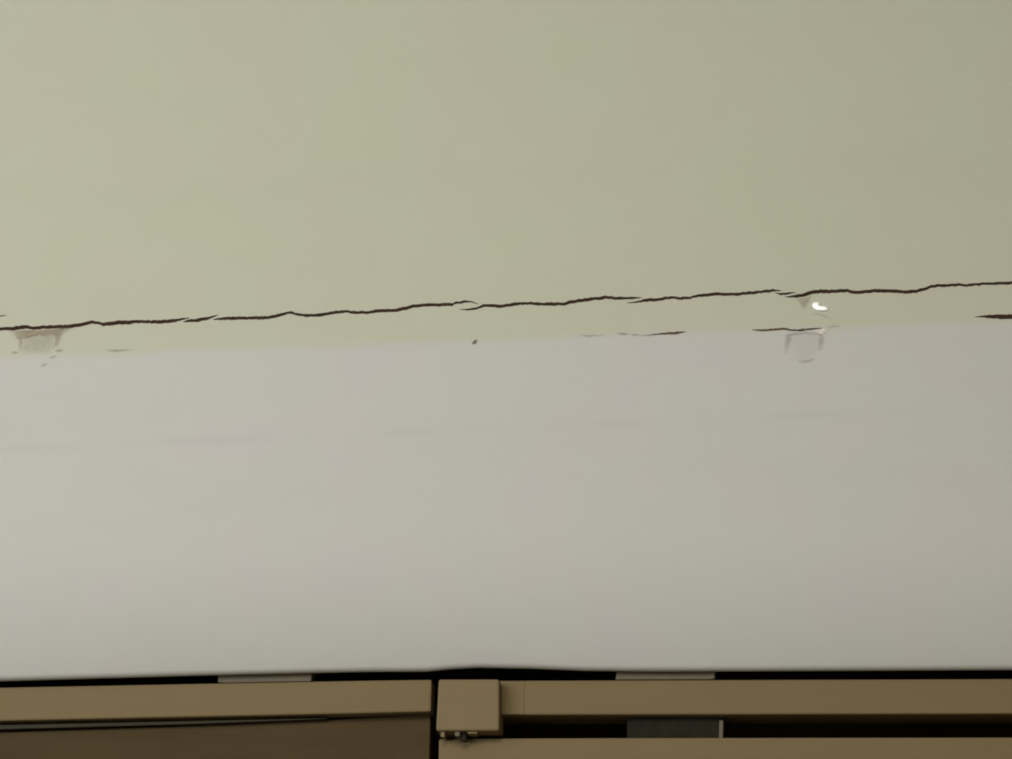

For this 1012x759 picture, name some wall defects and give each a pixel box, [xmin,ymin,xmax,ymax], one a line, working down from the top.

crack [0,281,1012,331]
crack [651,329,684,337]
crack [752,326,821,334]